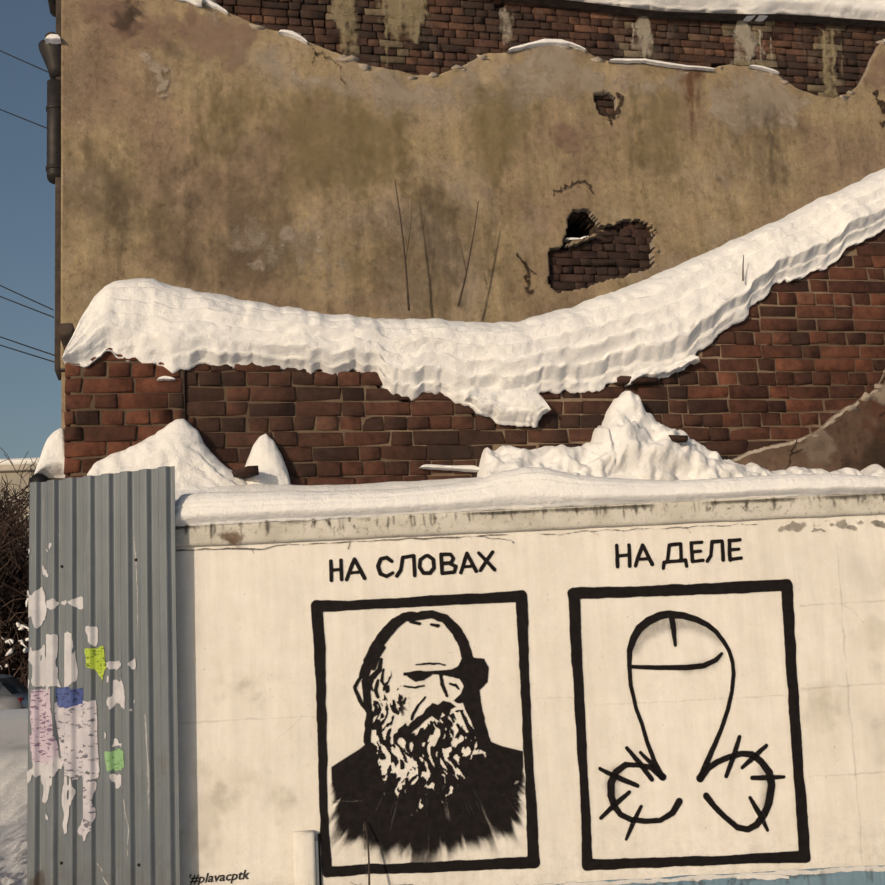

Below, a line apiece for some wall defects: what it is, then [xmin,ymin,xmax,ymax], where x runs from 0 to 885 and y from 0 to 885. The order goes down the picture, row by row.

spalling [205,0,885,101]
spalling [594,93,619,121]
crack [553,180,594,196]
spalling [548,212,661,293]
crack [516,253,536,294]